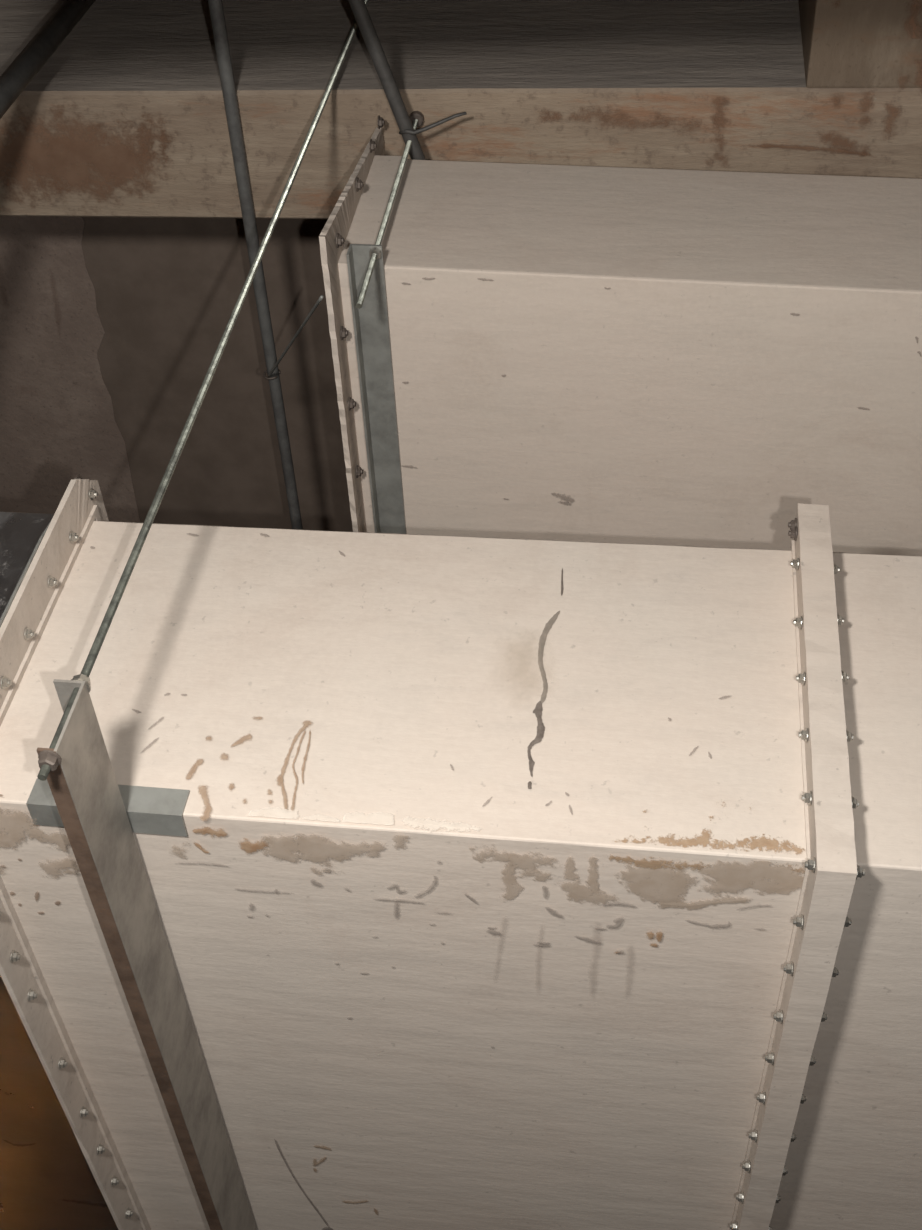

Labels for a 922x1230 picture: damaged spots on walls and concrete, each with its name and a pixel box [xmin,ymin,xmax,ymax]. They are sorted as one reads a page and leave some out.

corrosion [759,134,869,156]
crack [527,569,563,789]
peeling [264,835,409,875]
peeling [470,848,615,904]
peeling [617,861,806,910]